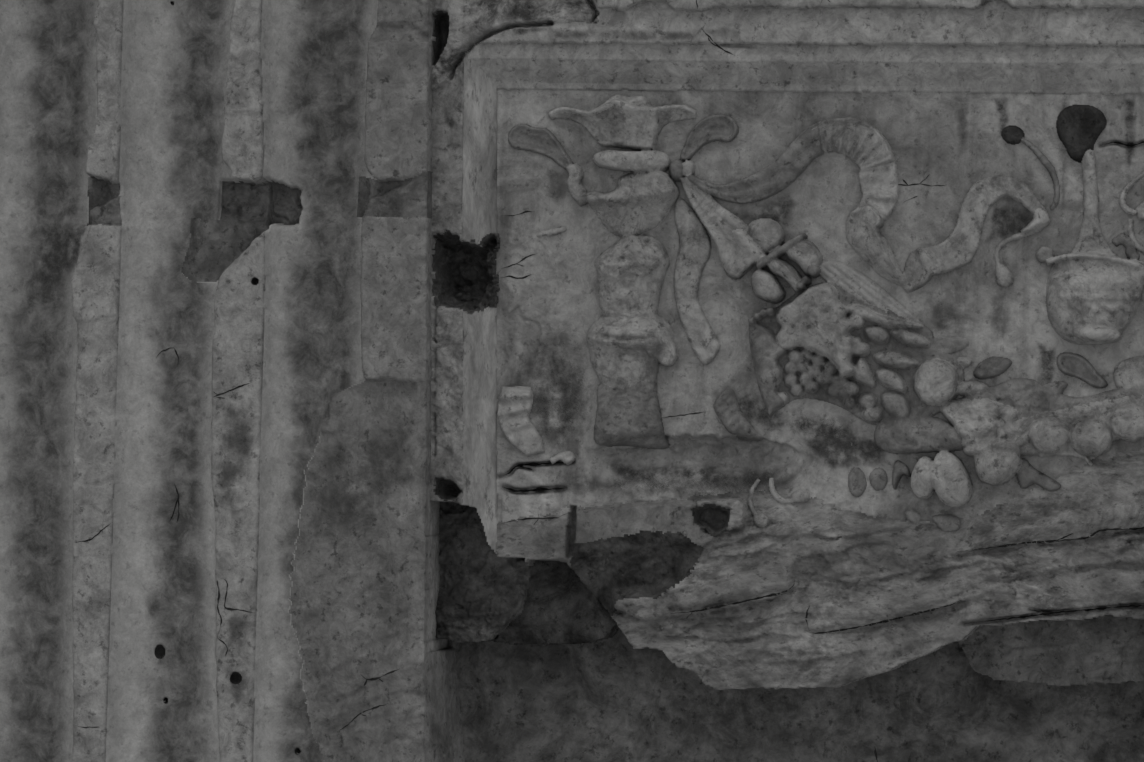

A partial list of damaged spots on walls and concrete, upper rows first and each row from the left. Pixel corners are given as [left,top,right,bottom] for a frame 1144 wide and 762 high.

spalling [432,11,449,66]
spalling [432,221,573,372]
spalling [433,445,1144,690]